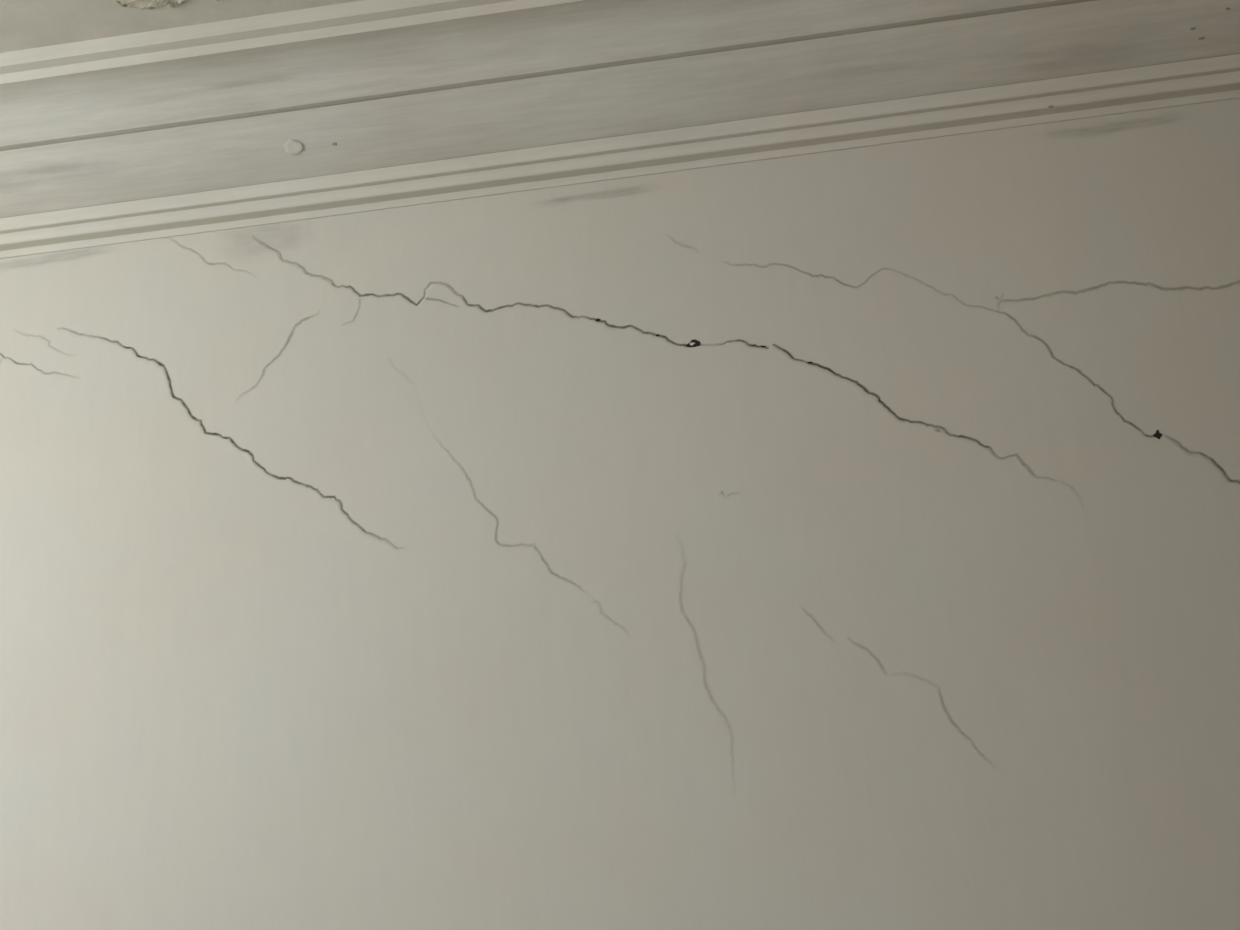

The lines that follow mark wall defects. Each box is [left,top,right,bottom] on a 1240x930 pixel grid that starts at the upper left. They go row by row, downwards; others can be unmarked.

crack [55,329,406,553]
crack [249,236,1058,485]
crack [1153,430,1240,490]